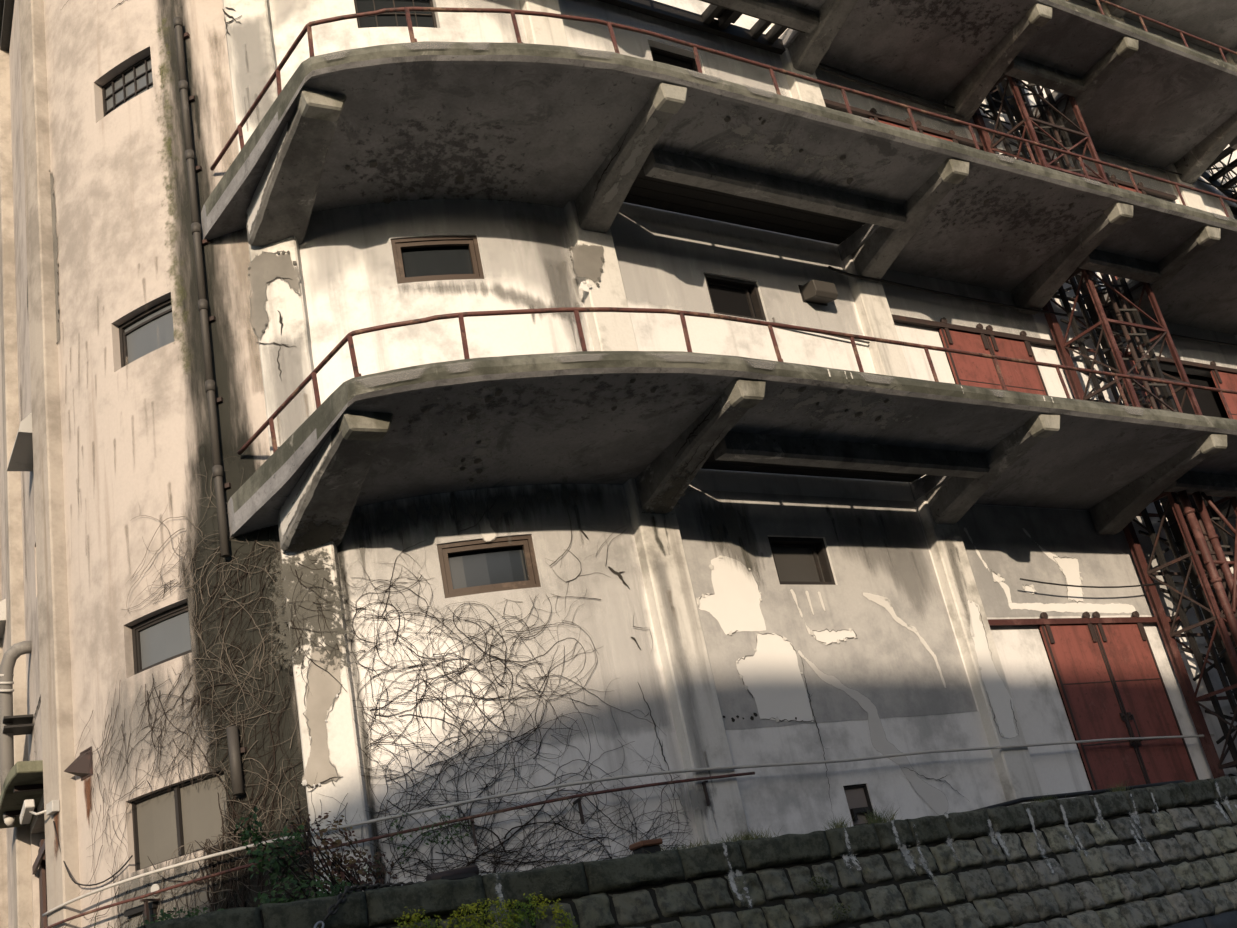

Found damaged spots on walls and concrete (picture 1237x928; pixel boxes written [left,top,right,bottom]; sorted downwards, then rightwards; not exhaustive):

water stain [574,47,611,58]
peeling [248,250,301,340]
crack [256,311,296,381]
water stain [657,353,710,362]
water stain [111,0,603,909]
crack [608,567,630,589]
peeling [964,528,1136,614]
peeling [696,555,814,722]
peeling [810,628,857,645]
peeling [301,643,342,788]
crack [638,683,686,815]
water stain [723,843,751,906]